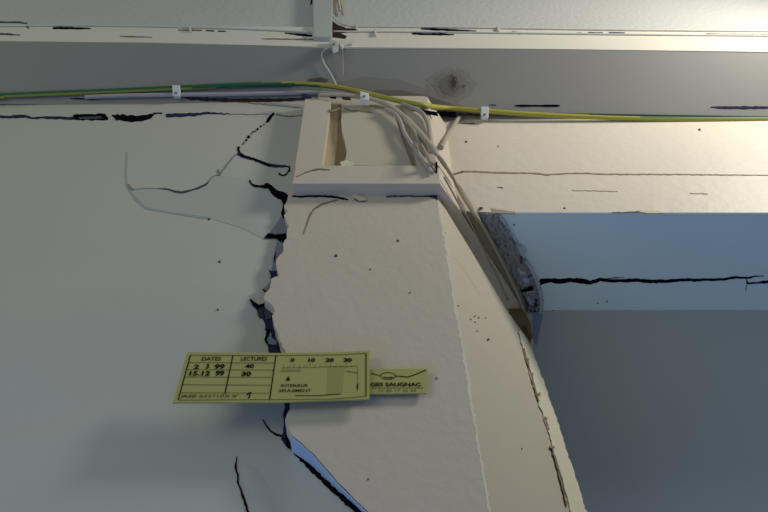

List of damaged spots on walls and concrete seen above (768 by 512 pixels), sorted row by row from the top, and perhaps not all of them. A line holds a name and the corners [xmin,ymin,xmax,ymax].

crack [0,97,365,353]
flaking render [478,207,544,314]
crack [522,276,768,312]
crack [235,457,249,512]
crack [262,403,362,512]
crack [523,348,567,506]